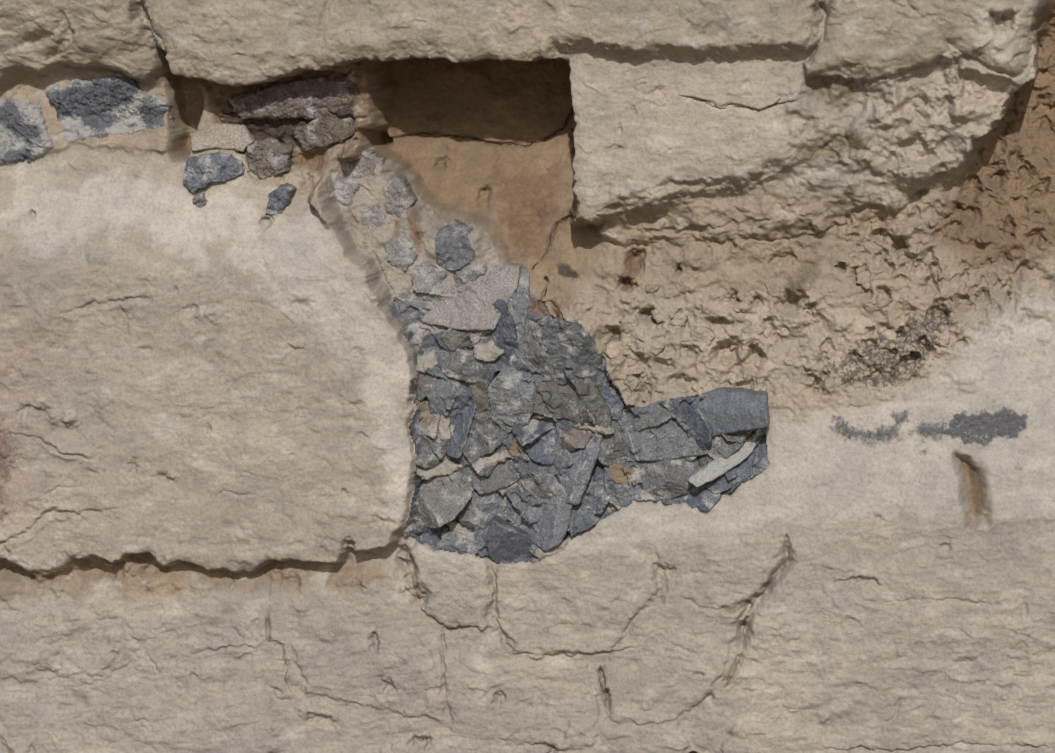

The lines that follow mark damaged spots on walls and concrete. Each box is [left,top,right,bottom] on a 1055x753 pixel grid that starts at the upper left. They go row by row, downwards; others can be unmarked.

crack [382,108,575,154]
crack [678,94,799,112]
crack [532,207,580,320]
spalling [328,0,1055,564]
crack [267,611,292,700]
crack [599,666,610,713]
crack [721,536,790,689]